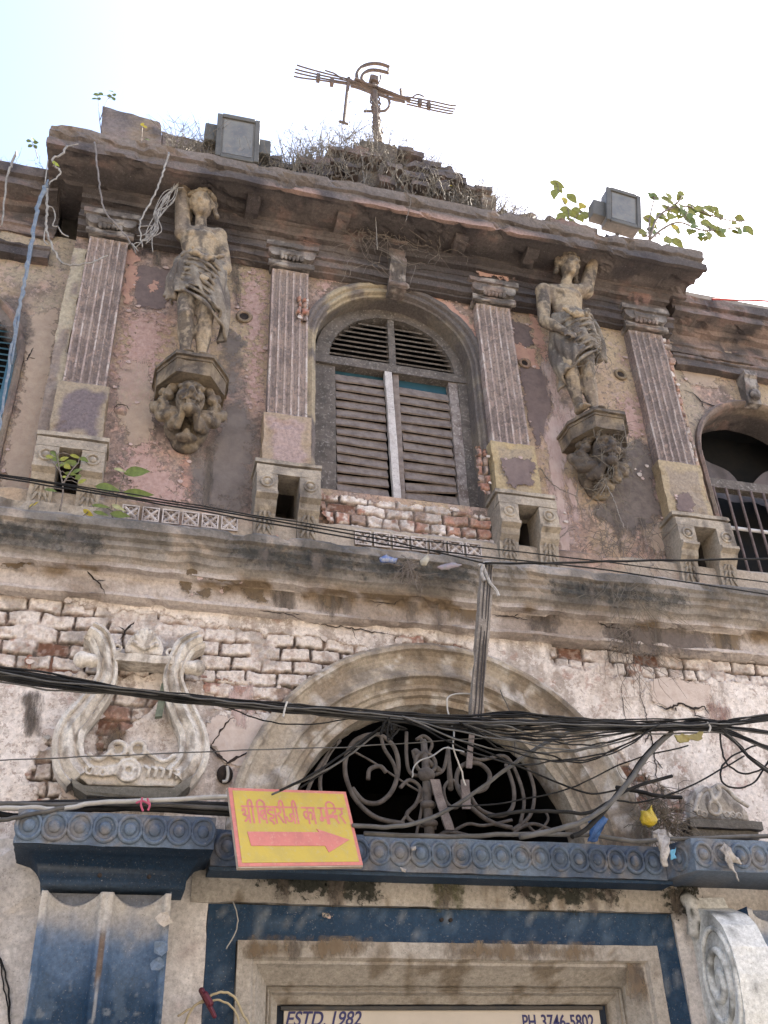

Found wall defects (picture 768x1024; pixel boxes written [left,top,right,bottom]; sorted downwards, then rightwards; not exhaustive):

peeling [109,249,194,508]
peeling [475,314,553,496]
spalling [321,493,494,543]
peeling [674,492,696,513]
spalling [394,634,427,644]
spalling [0,595,369,766]
spalling [550,646,768,711]
crack [621,688,710,785]
leakage [509,886,625,915]
leakage [657,886,703,921]